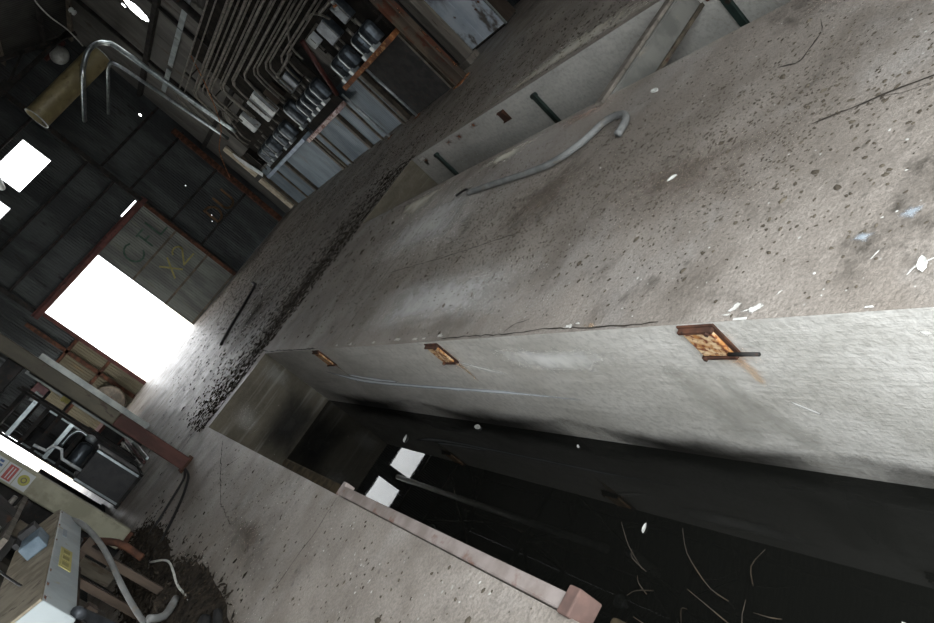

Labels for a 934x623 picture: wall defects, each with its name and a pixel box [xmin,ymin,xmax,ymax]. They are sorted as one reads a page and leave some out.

crack [812,74,934,124]